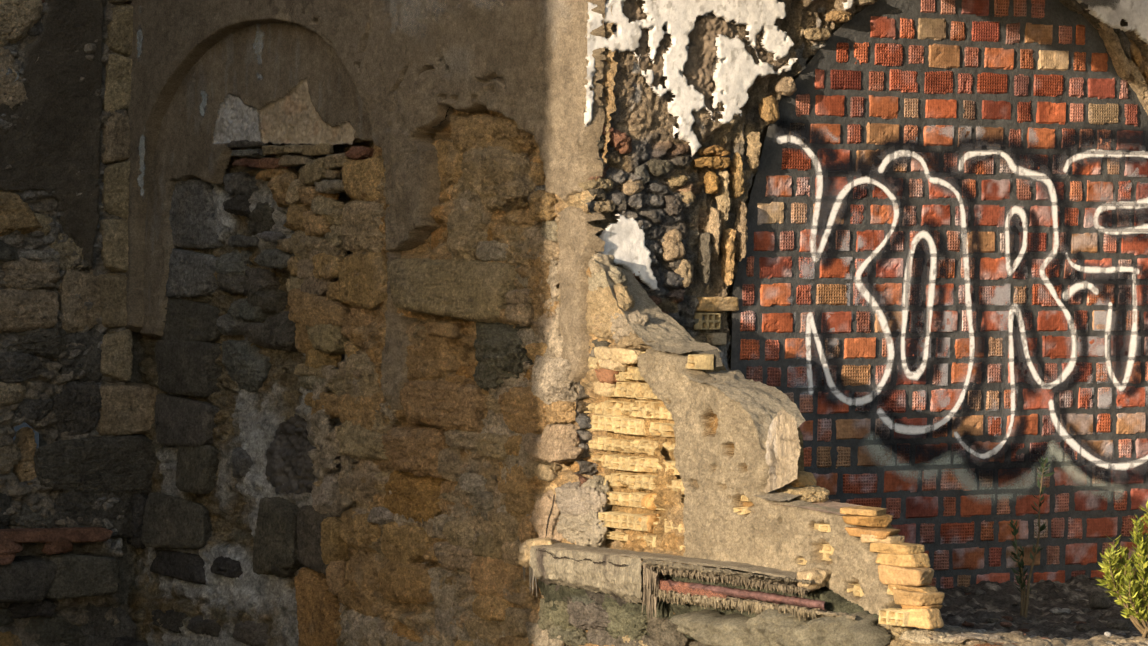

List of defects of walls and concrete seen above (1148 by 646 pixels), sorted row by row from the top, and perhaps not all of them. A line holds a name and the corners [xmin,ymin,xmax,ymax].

peeling [623,0,666,87]
peeling [684,14,791,121]
spalling [213,78,356,145]
peeling [265,414,317,495]
corrosion [641,579,826,611]